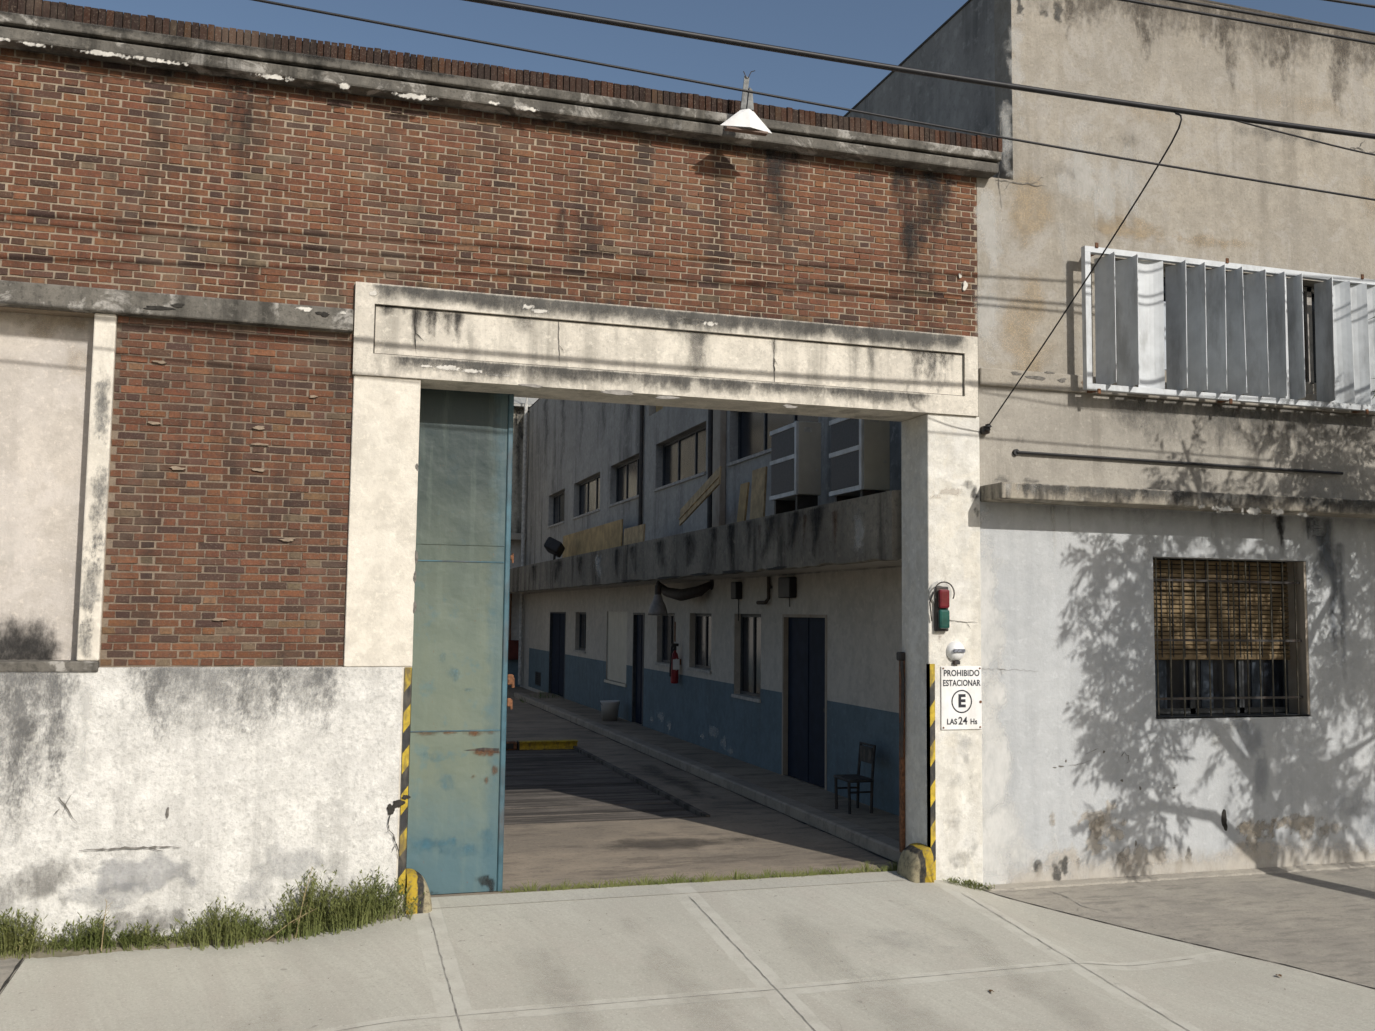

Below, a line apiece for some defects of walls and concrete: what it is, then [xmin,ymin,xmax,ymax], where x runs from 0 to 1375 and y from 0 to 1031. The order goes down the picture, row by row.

damp [1041,0,1375,97]
damp [376,285,964,376]
damp [399,357,926,404]
damp [514,407,524,472]
damp [1022,480,1375,633]
peeling [1199,505,1308,517]
damp [0,672,74,773]
damp [140,666,337,713]